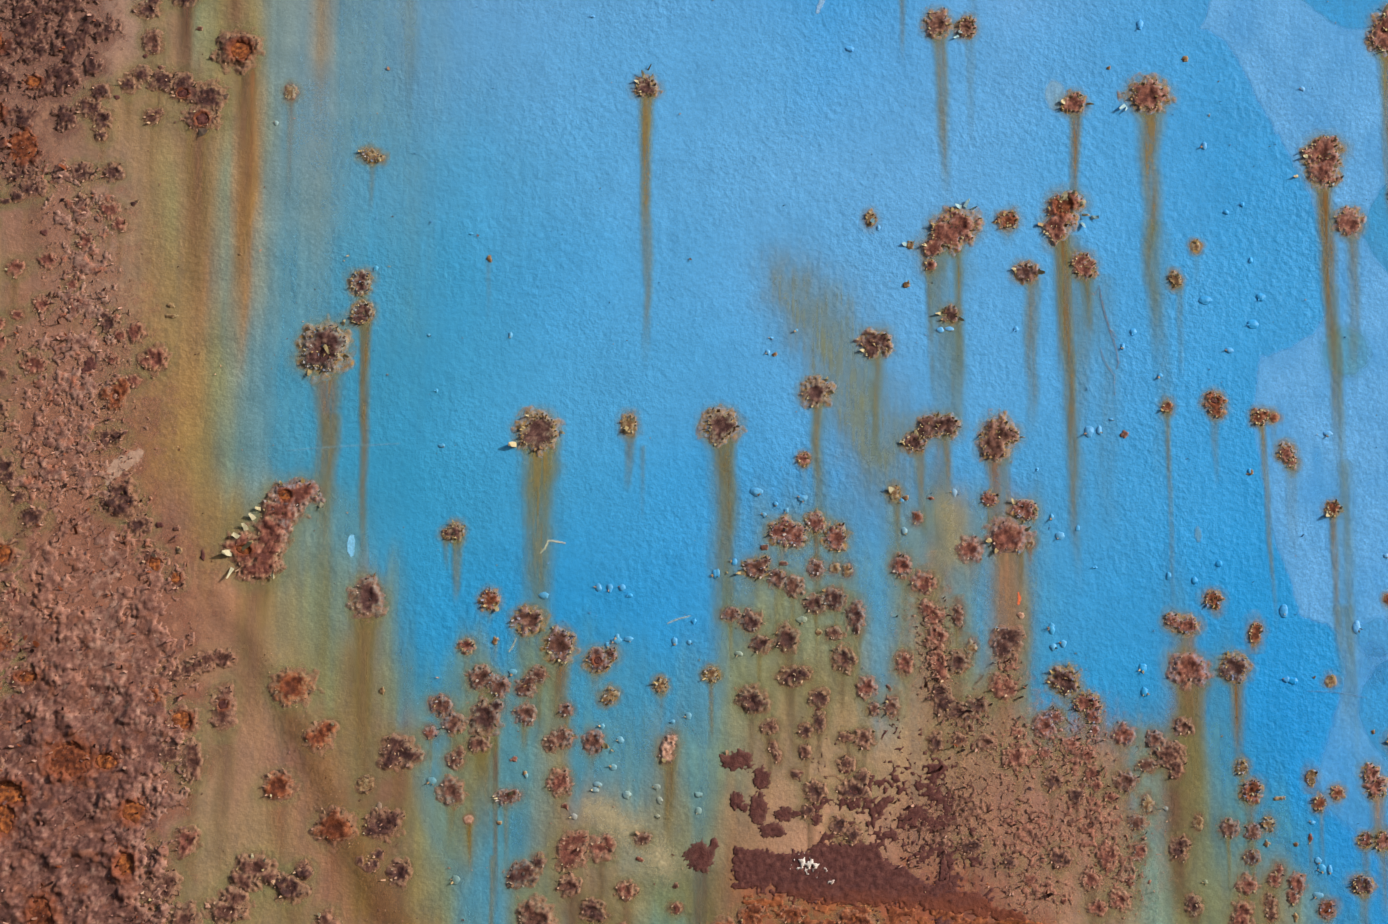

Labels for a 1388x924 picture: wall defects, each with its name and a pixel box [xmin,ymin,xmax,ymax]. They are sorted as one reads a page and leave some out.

rust [631,64,663,225]
rust [346,269,377,502]
rust [477,587,502,613]
rust [652,675,669,694]
rust [152,884,167,898]